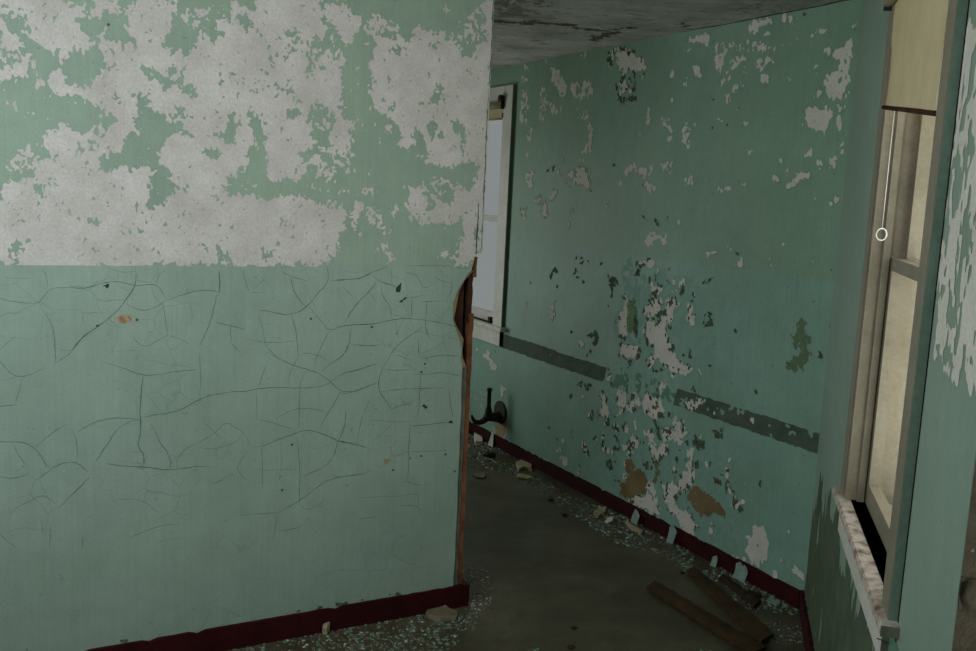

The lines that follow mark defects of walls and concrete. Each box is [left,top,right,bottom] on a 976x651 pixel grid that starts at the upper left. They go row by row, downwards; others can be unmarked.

peeling [0,0,599,372]
peeling [606,45,647,105]
peeling [612,161,673,194]
peeling [639,107,696,149]
peeling [687,12,806,111]
peeling [772,22,857,190]
crack [0,0,494,549]
peeling [556,214,746,544]
peeling [732,524,805,583]
flaking render [952,459,976,651]